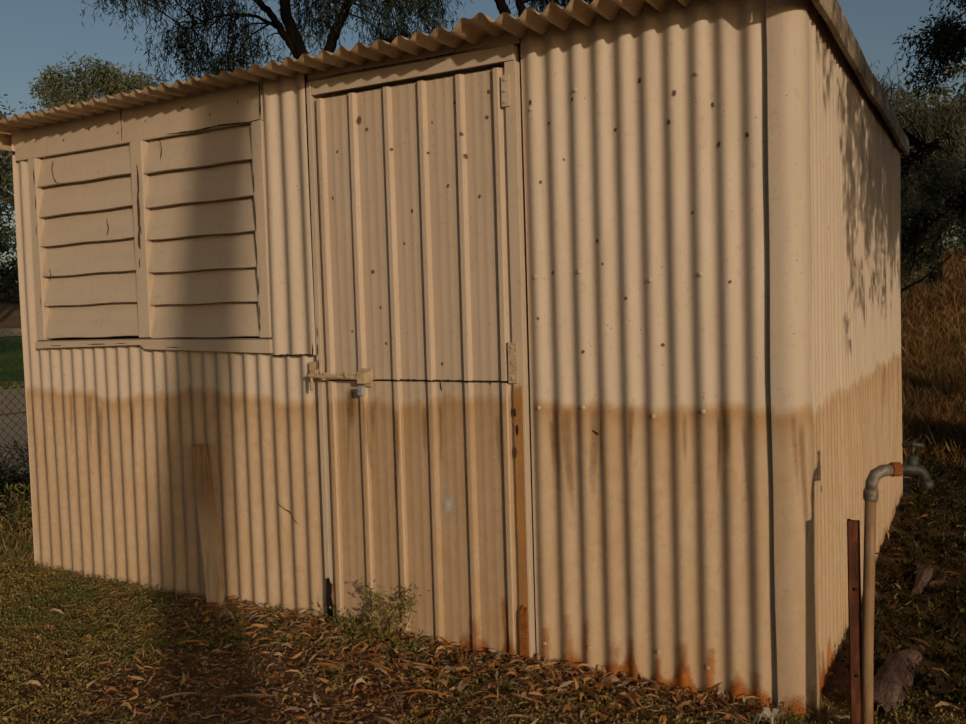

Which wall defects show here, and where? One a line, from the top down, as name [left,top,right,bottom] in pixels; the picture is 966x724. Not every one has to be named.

damp [513,386,530,664]
corrosion [458,604,515,662]
corrosion [543,633,842,721]